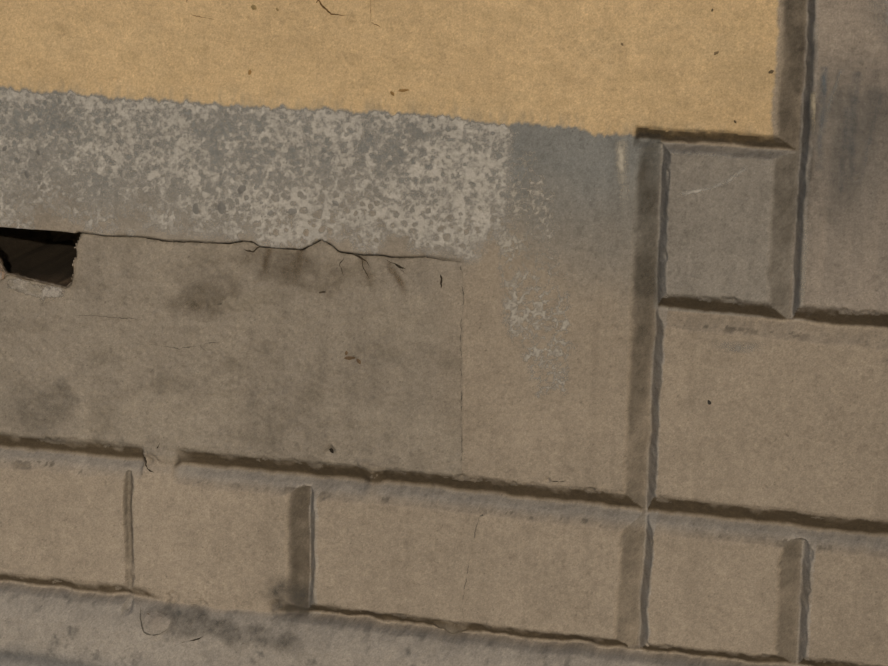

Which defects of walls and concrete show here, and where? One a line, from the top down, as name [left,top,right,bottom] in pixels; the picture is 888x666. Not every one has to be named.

peeling [0,88,513,301]
crack [81,229,464,460]